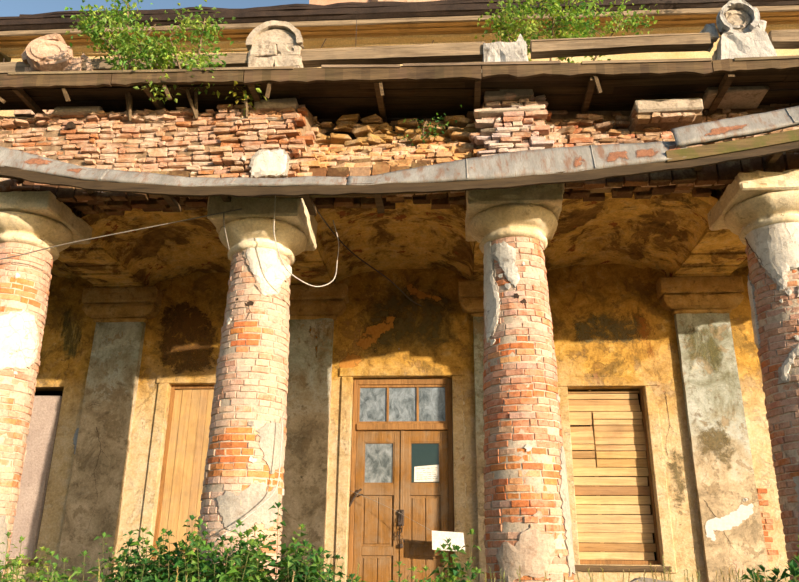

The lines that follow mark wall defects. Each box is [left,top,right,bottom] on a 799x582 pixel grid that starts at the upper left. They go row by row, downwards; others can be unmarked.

spalling [0,107,229,129]
peeling [242,148,290,178]
spalling [312,114,477,176]
spalling [556,114,663,146]
peeling [0,273,41,375]
damp [156,300,218,375]
peeling [236,238,292,306]
peeling [483,241,535,363]
damp [574,312,640,343]
flaking render [207,421,284,495]
peeling [491,444,563,582]
spalling [705,488,779,561]